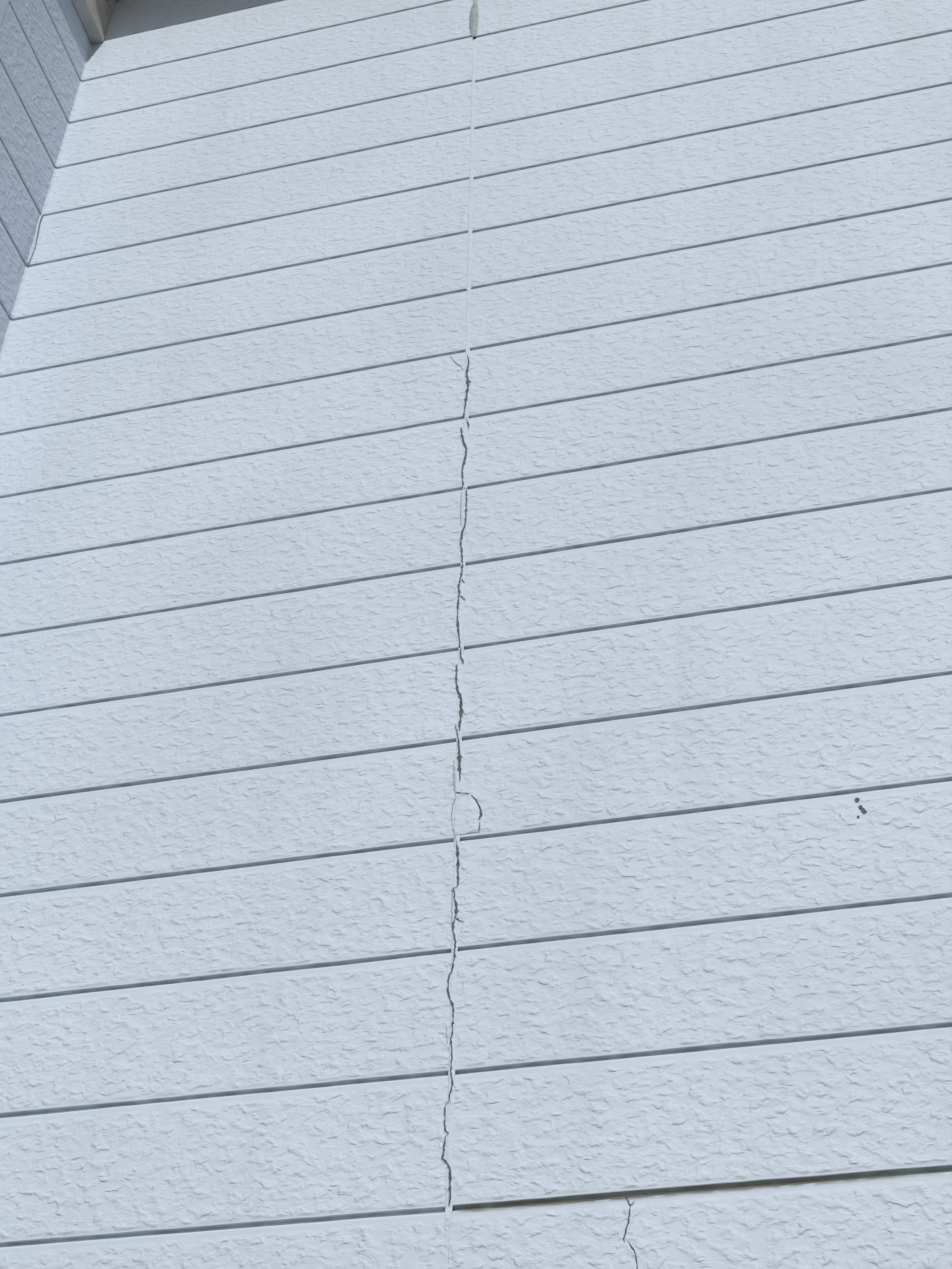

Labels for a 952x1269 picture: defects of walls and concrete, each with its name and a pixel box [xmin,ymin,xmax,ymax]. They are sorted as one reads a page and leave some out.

crack [441,355,482,1206]
crack [623,1194,638,1269]